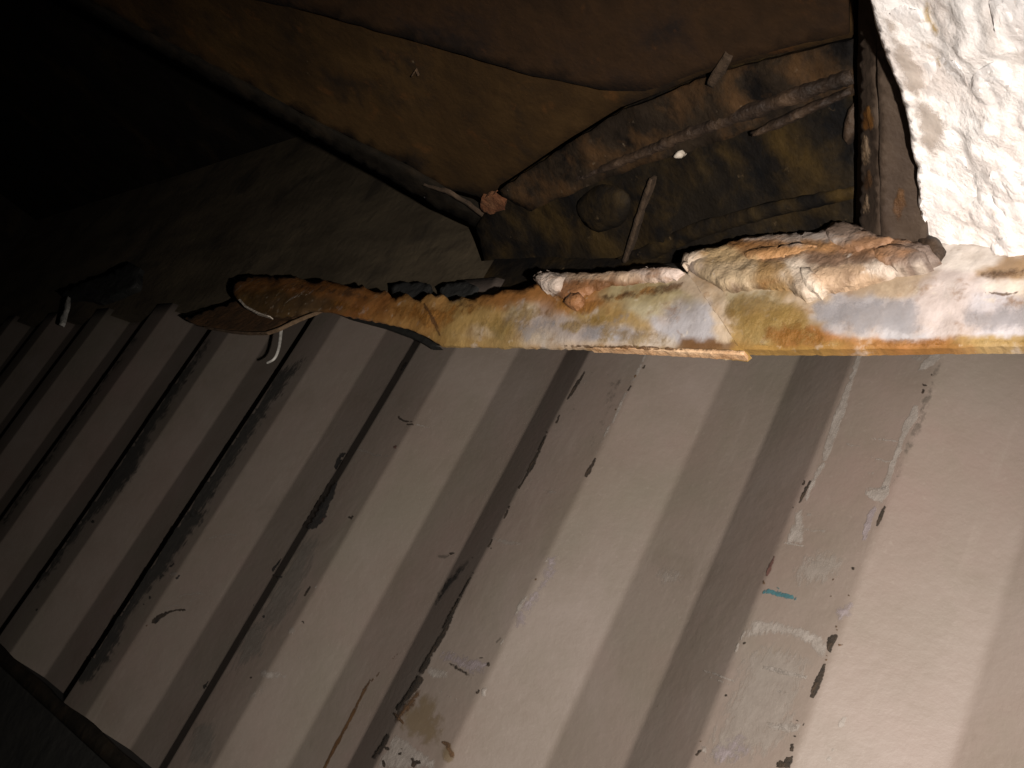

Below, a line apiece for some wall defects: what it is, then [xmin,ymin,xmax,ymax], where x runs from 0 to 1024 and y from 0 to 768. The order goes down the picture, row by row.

corrosion [532,101,942,313]